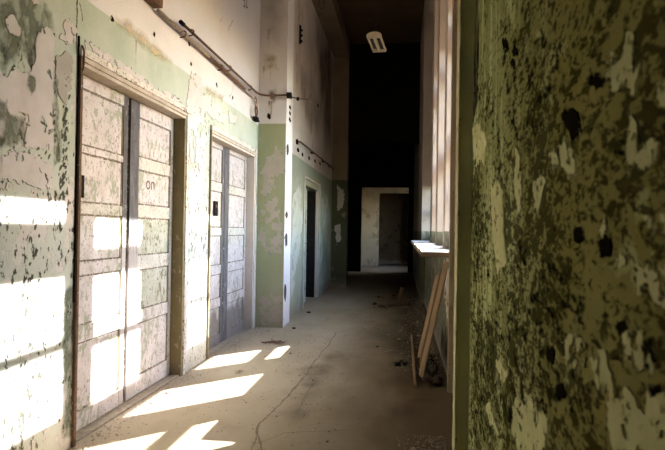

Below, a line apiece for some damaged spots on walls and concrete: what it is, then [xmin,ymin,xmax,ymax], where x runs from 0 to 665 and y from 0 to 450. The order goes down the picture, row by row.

peeling [0,18,78,207]
peeling [84,39,237,215]
peeling [472,119,487,168]
peeling [548,106,581,180]
peeling [586,31,642,97]
peeling [625,114,661,179]
peeling [257,144,303,326]
peeling [490,174,507,274]
peeling [598,213,665,310]
crack [250,332,344,450]
peeling [511,392,549,450]
peeling [561,321,665,450]